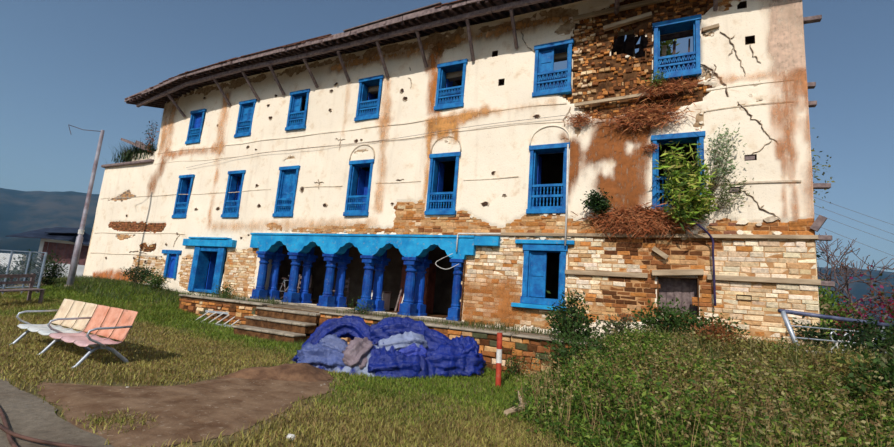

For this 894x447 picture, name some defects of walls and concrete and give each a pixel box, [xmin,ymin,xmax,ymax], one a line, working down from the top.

leakage [149,103,204,192]
leakage [215,93,229,154]
peeling [167,26,466,103]
leakage [331,34,489,210]
spalling [478,0,742,140]
crack [700,31,779,155]
leakage [772,71,808,162]
spalling [108,190,136,202]
spalling [108,214,168,284]
spalling [178,255,193,290]
spalling [266,200,820,350]